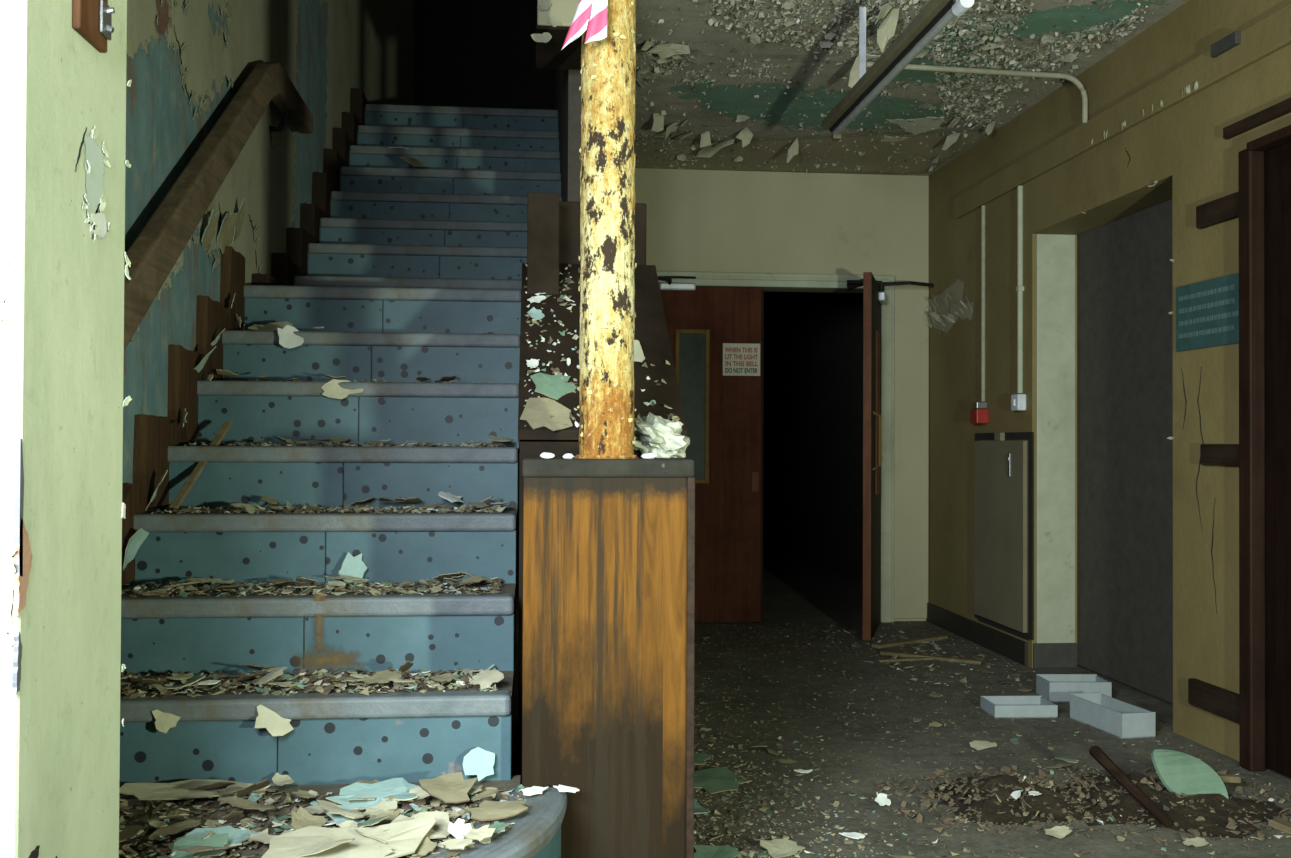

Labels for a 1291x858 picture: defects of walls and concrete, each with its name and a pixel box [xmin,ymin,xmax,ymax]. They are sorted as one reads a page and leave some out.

peeling [75,0,238,280]
peeling [612,0,1170,172]
peeling [527,295,546,320]
peeling [520,359,593,437]
peeling [615,340,645,362]
spalling [2,439,33,693]